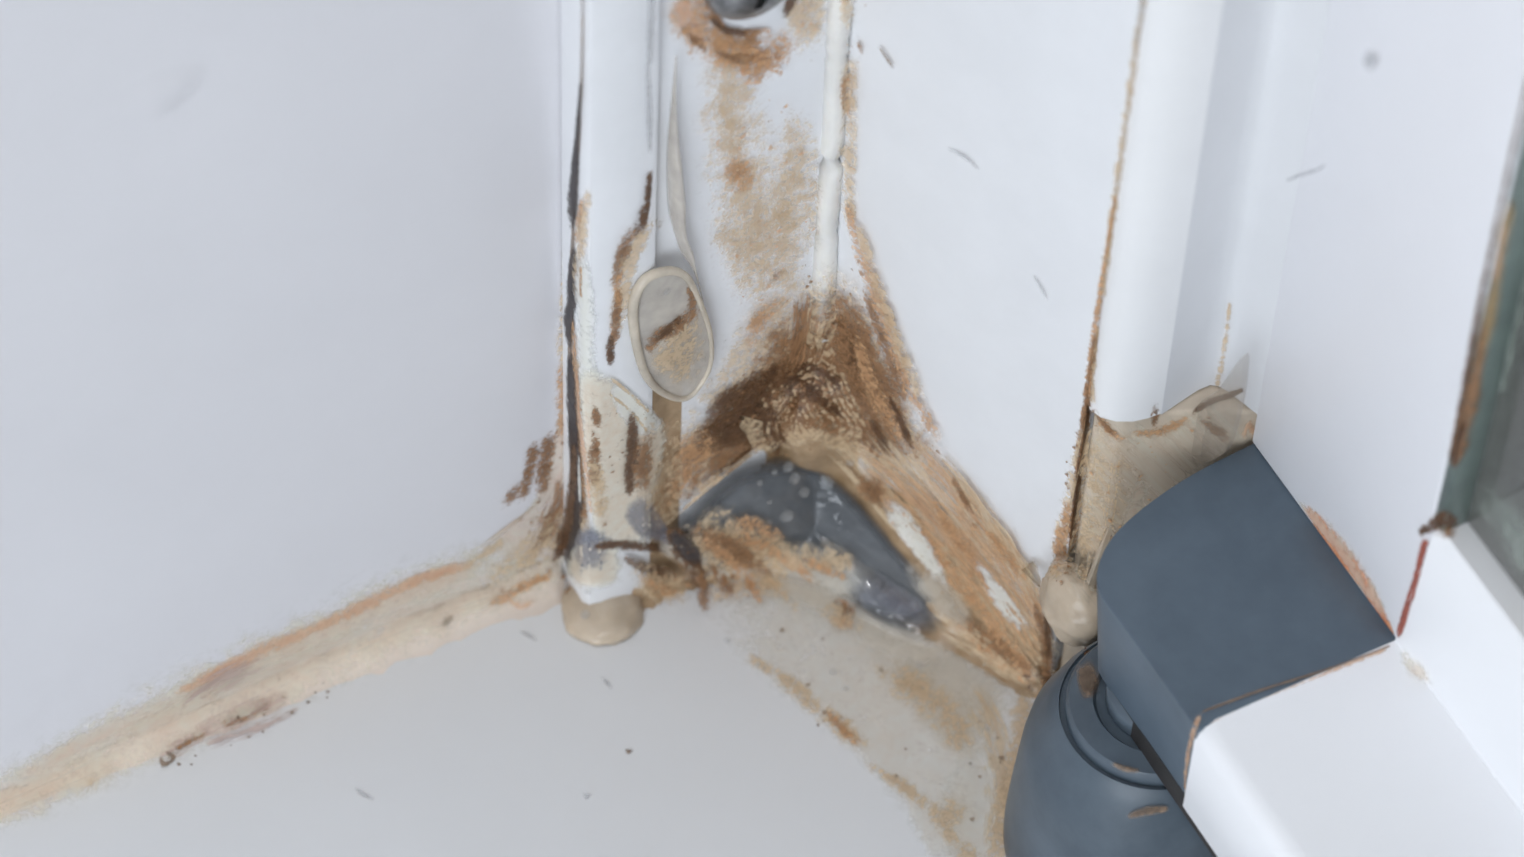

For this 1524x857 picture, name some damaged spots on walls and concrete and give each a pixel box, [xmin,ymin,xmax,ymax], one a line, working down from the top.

corrosion [669,0,893,224]
water stain [469,172,653,609]
crack [556,0,589,576]
water stain [624,206,945,510]
corrosion [845,0,1254,691]
water stain [595,511,852,610]
water stain [159,682,329,767]
water stain [751,657,866,746]
water stain [872,666,1033,857]